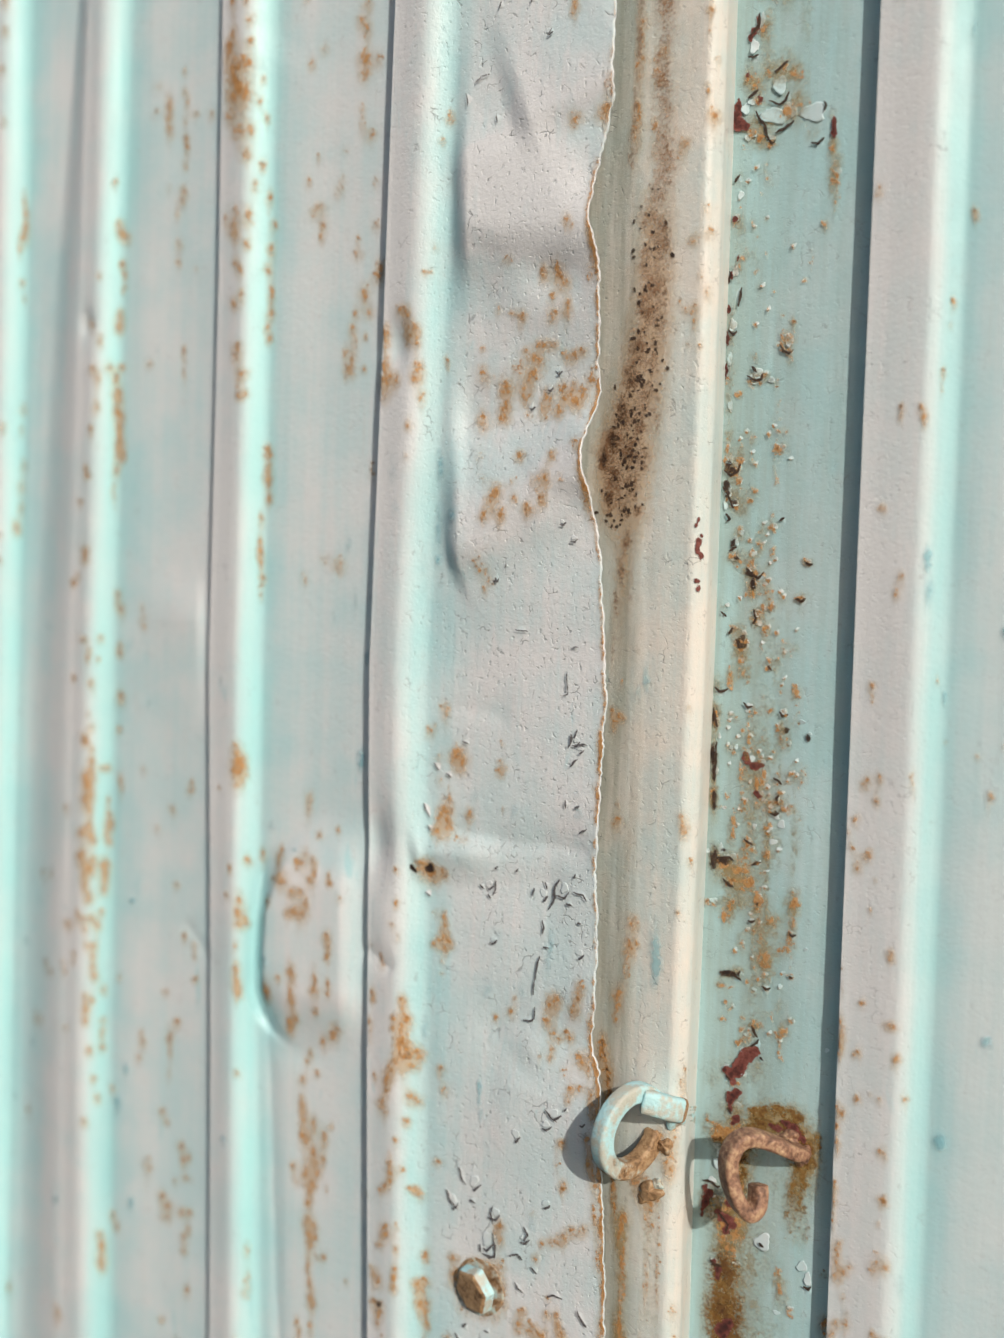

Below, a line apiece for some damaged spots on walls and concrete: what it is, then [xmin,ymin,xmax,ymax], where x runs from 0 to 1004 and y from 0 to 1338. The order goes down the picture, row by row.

rust [156,30,268,167]
peeling [733,12,842,203]
rust [381,306,424,399]
rust [479,3,696,614]
rust [66,735,122,977]
peeling [540,882,569,902]
rust [290,1096,327,1308]
rust [373,997,425,1112]
peeling [482,1208,500,1259]
peeling [541,1109,562,1132]
rust [739,1148,750,1191]
rust [743,1095,859,1240]